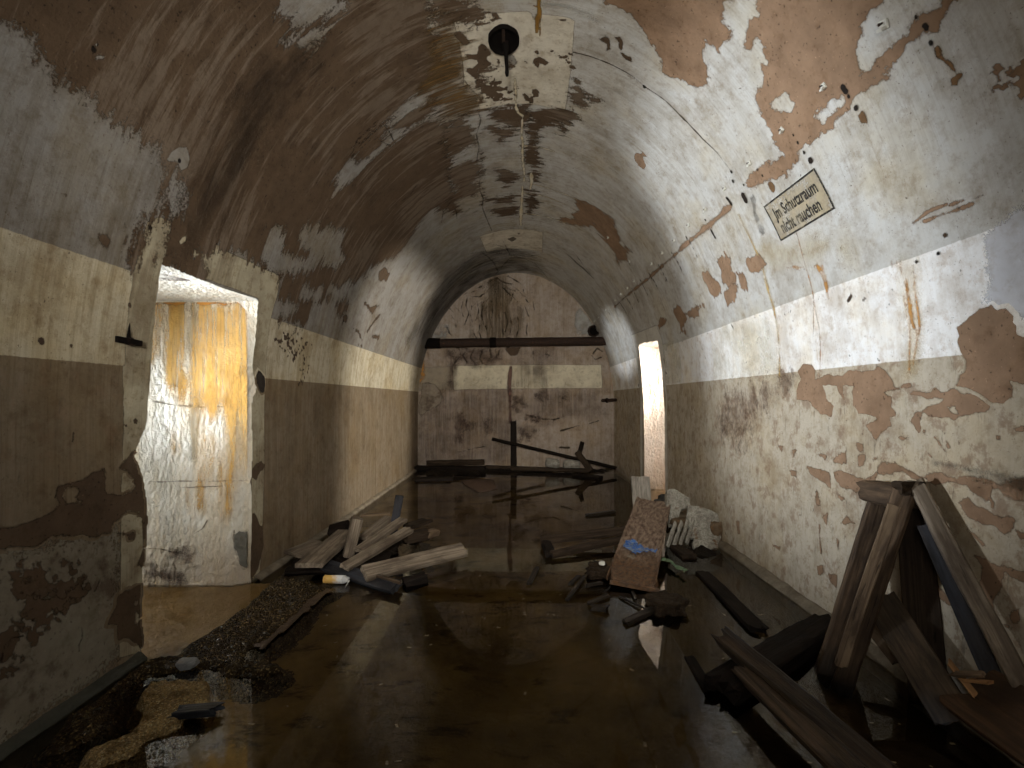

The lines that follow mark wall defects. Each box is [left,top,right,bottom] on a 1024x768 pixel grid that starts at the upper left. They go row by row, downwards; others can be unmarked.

rust [151,302,247,513]
peeling [0,0,605,347]
crack [446,119,535,364]
peeling [557,199,632,265]
peeling [634,151,647,169]
peeling [600,0,734,88]
peeling [658,254,767,335]
peeling [743,0,958,188]
flaking render [780,300,1024,609]
rust [905,282,921,370]
peeling [990,59,1024,100]
flaking render [0,450,148,744]